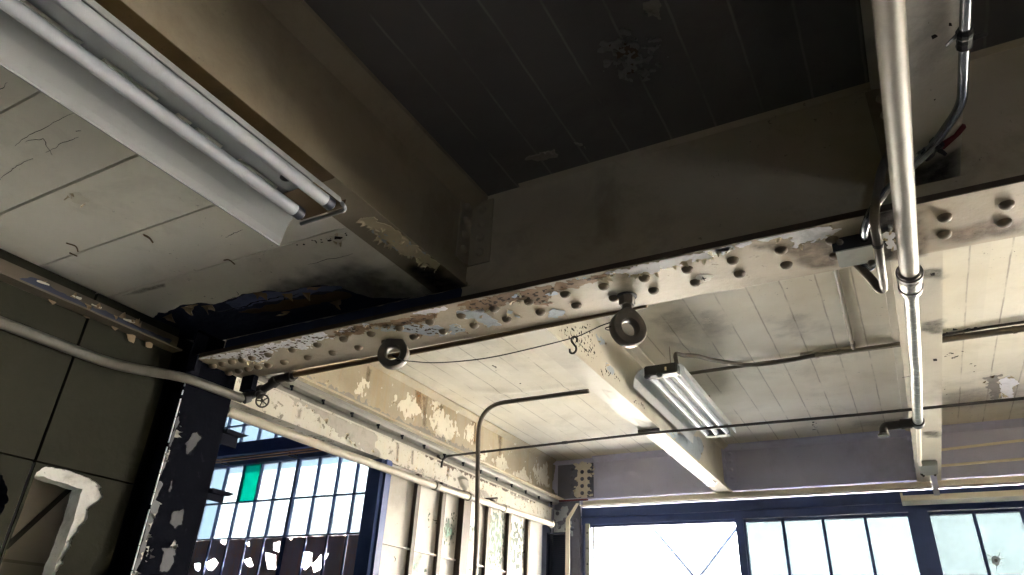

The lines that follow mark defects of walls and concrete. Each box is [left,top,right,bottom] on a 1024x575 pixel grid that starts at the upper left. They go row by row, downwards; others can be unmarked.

crack [0,113,79,180]
peeling [20,217,842,381]
peeling [132,411,201,575]
peeling [289,396,381,458]
peeling [307,375,595,536]
spalling [970,363,1019,400]